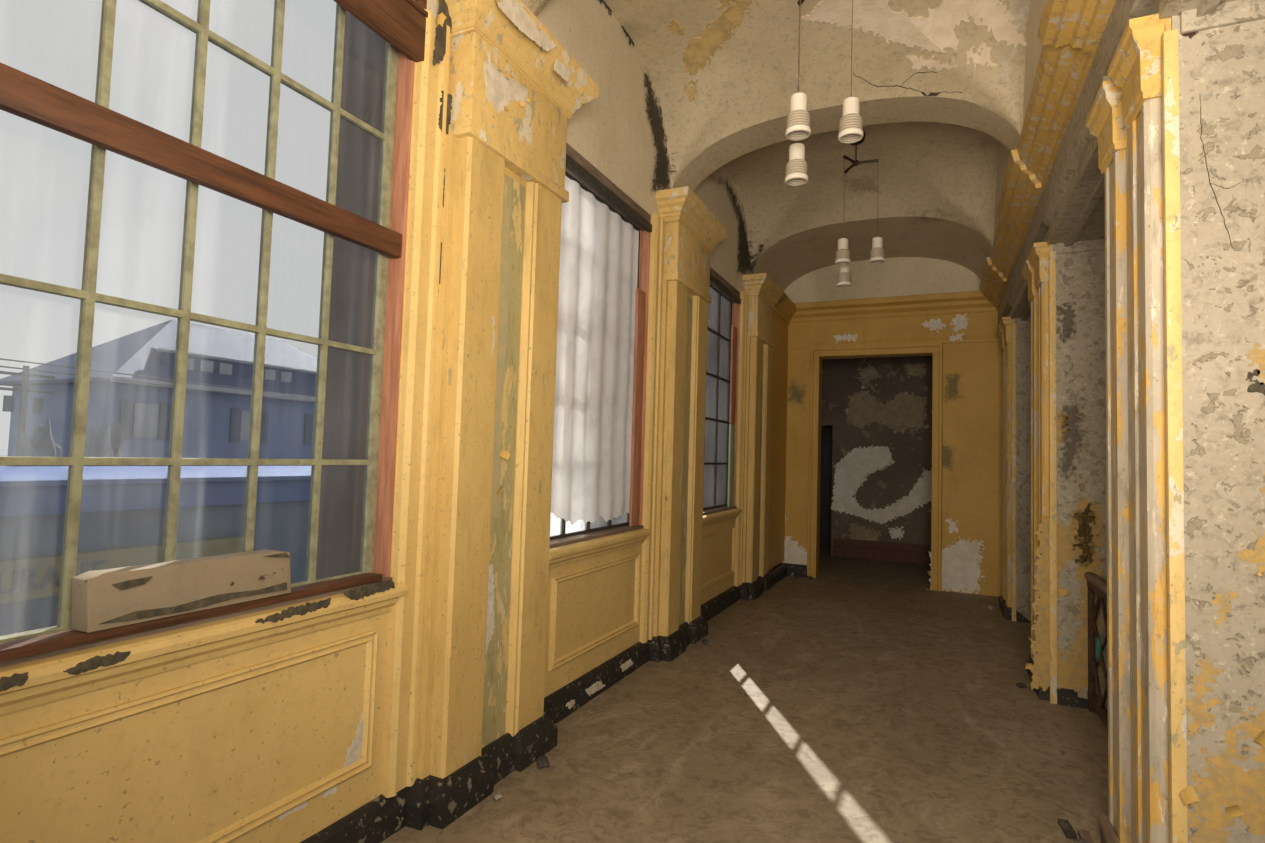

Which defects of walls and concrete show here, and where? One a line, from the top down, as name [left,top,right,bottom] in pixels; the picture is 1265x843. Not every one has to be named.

peeling [433,0,452,66]
peeling [496,0,571,82]
peeling [801,0,1031,85]
peeling [438,90,452,134]
peeling [1246,344,1265,396]
spalling [927,518,985,594]
peeling [100,582,287,624]
peeling [255,579,395,624]
peeling [1025,493,1106,694]
peeling [0,672,29,692]
peeling [63,651,131,675]
peeling [1177,657,1265,843]